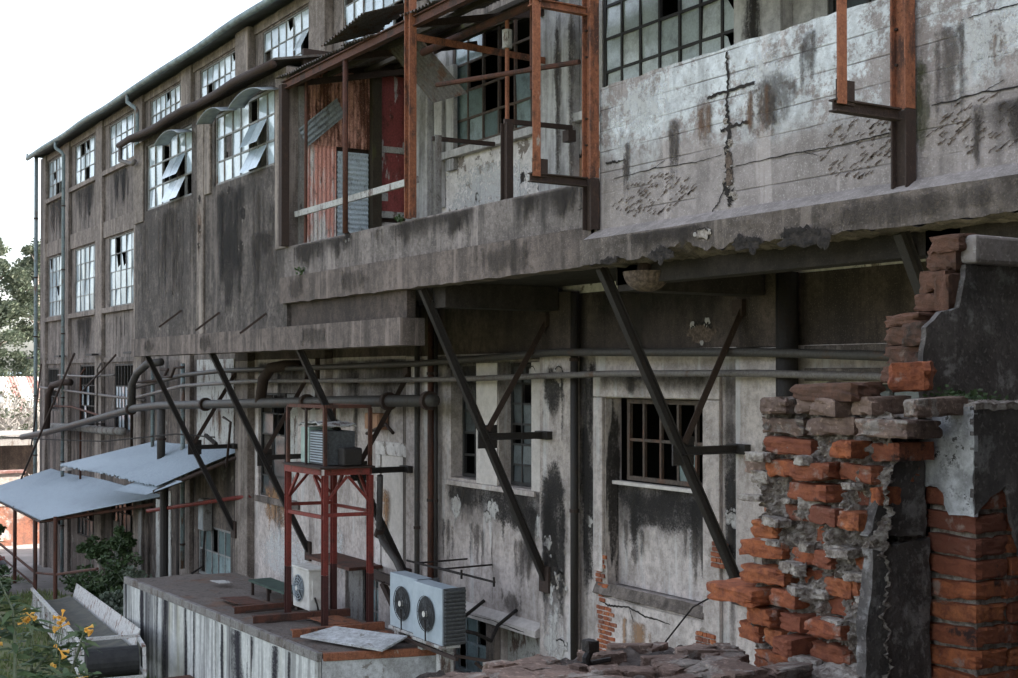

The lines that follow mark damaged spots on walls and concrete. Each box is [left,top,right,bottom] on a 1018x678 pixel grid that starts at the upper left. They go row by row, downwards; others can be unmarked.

water stain [742,0,761,40]
water stain [754,31,815,127]
water stain [934,24,964,111]
crack [605,51,889,212]
water stain [217,186,276,312]
spalling [647,244,674,266]
spalling [693,227,711,240]
spalling [731,233,764,255]
spalling [777,224,831,250]
water stain [624,496,643,560]
water stain [684,505,703,578]
spalling [595,548,617,651]